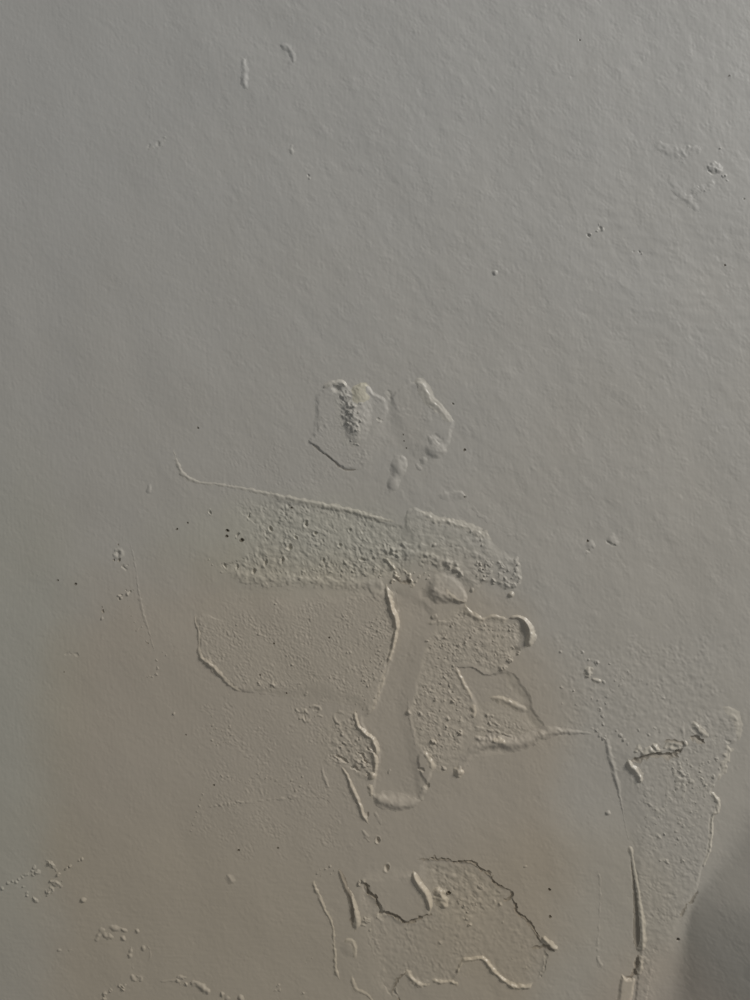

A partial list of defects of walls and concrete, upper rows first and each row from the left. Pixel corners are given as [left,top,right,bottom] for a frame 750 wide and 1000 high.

flaking render [173,451,452,591]
peeling [295,704,380,782]
peeling [404,603,545,773]
peeling [580,650,743,1000]
peeling [357,855,558,1000]